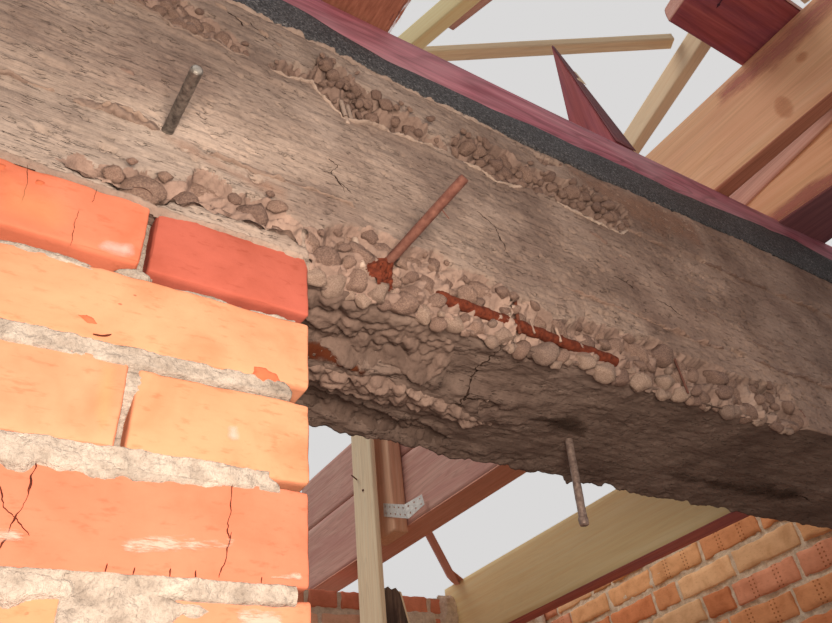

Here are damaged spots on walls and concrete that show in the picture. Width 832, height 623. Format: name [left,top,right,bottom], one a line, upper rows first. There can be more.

rust [366,174,468,291]
spalling [301,385,441,446]
crack [458,345,501,405]
crack [0,463,37,548]
crack [219,485,233,576]